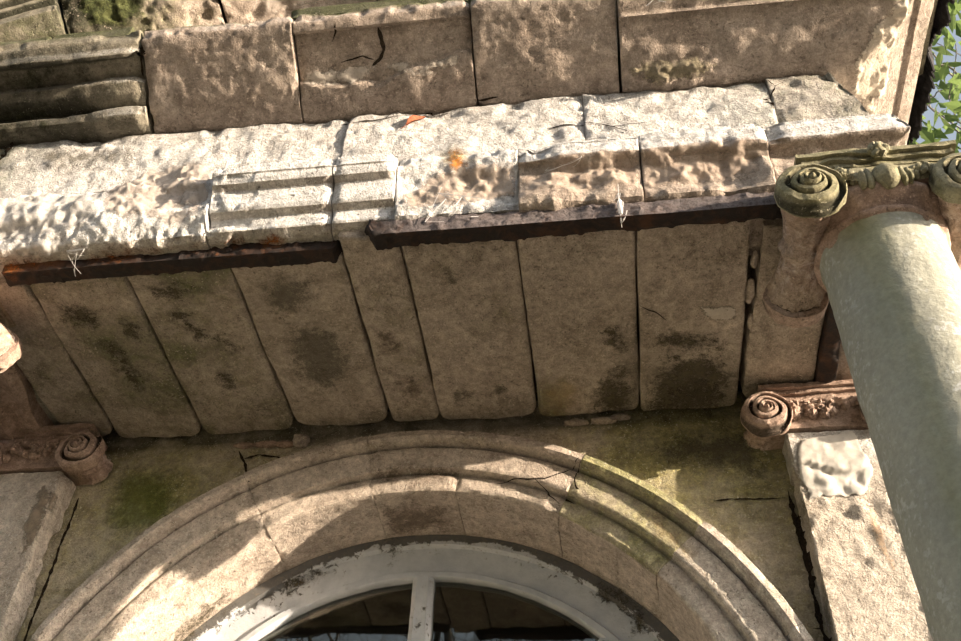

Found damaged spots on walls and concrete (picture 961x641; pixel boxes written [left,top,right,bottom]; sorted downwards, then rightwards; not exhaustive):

crack [341,28,386,66]
spalling [851,0,909,114]
crack [0,142,13,160]
corrosion [448,150,467,169]
crack [547,122,643,131]
damp [593,327,729,426]
damp [110,476,171,529]
crack [498,457,581,503]
flaking render [797,430,873,502]
crack [23,498,79,641]
crack [714,491,832,641]